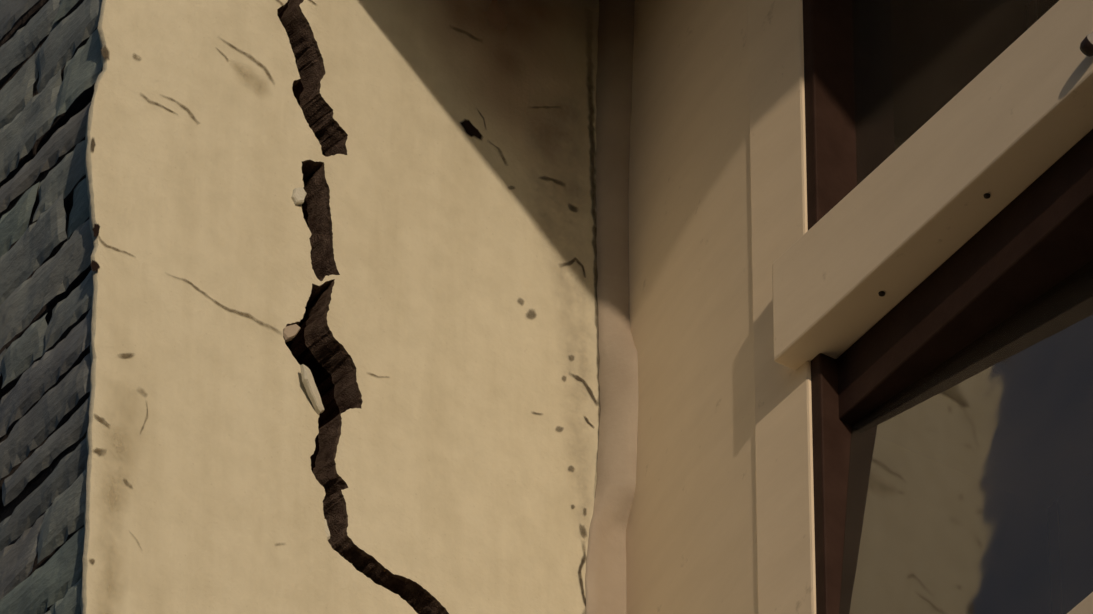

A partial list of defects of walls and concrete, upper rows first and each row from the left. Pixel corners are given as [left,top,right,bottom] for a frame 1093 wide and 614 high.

crack [184,0,449,614]
crack [588,72,601,435]
crack [578,551,586,606]